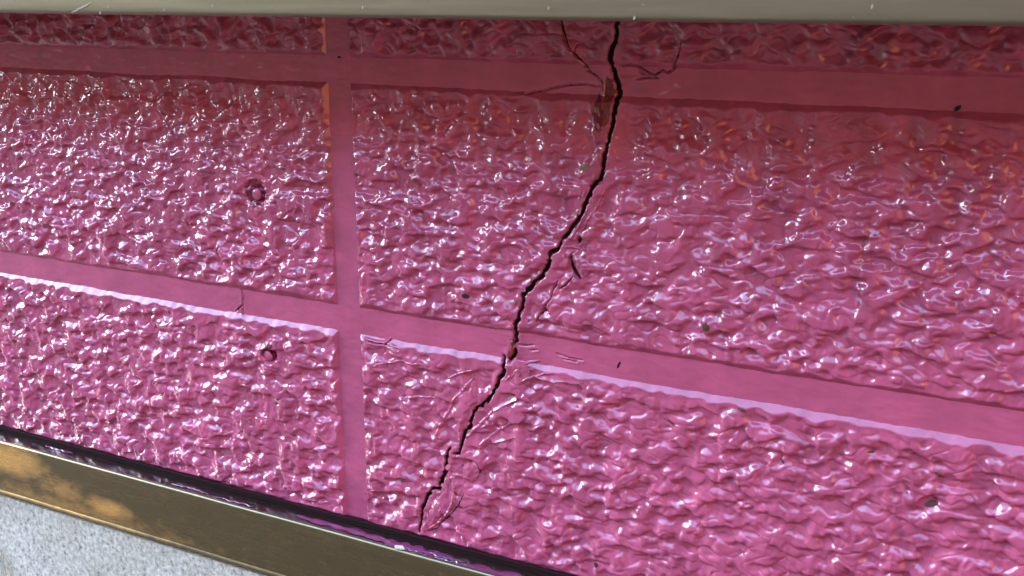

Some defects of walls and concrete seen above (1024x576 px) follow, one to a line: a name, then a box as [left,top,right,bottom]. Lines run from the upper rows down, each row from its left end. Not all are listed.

crack [419,21,680,530]